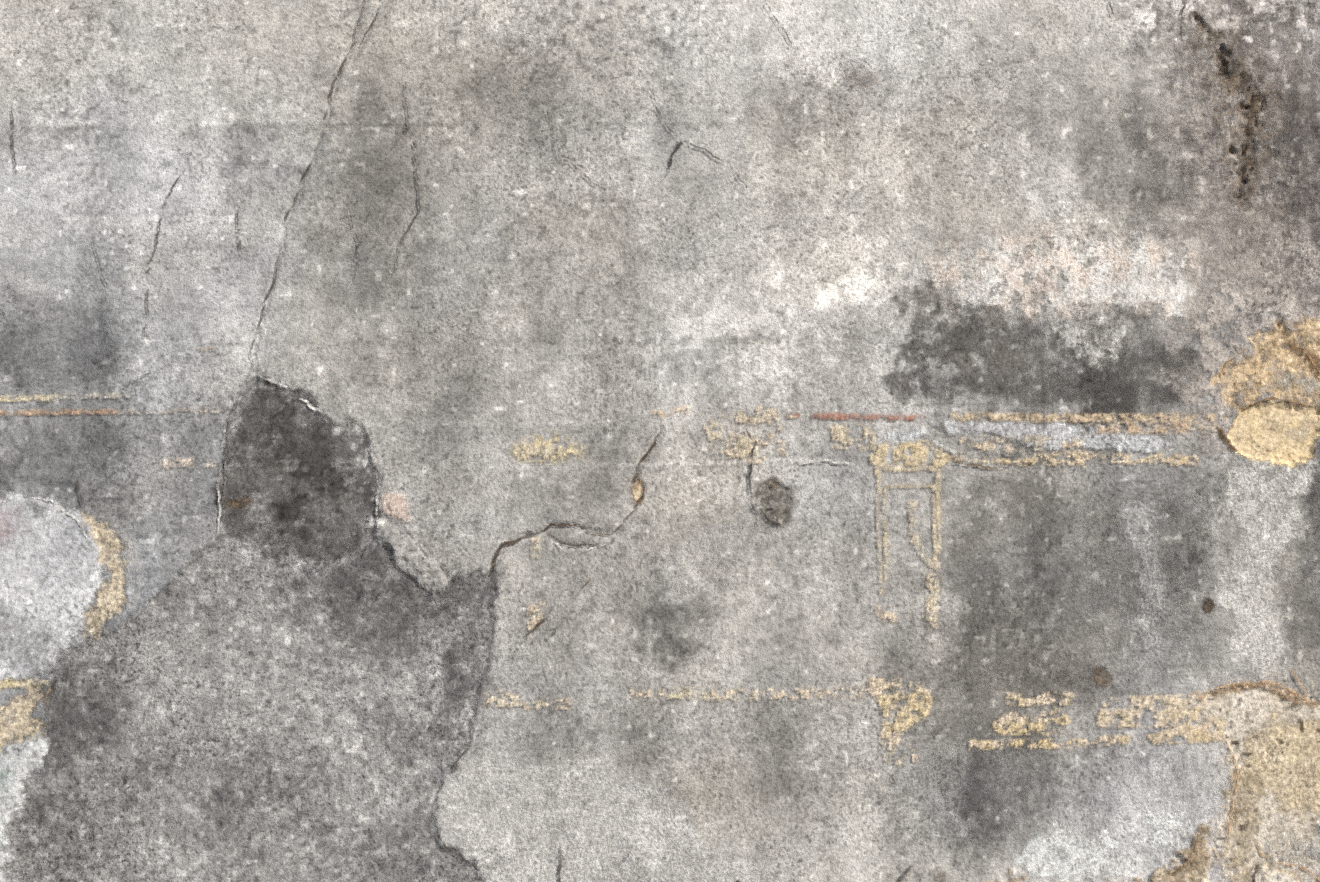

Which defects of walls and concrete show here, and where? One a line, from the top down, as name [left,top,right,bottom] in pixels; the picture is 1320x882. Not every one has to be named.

crack [250,148,318,370]
crack [325,0,378,118]
crack [394,82,421,272]
water stain [883,207,1320,452]
water stain [1175,0,1320,215]
water stain [213,376,420,639]
crack [525,616,550,636]
crack [490,431,661,586]
spalling [704,317,1320,628]
water stain [1125,460,1313,690]
water stain [428,748,781,882]
spalling [969,670,1320,882]